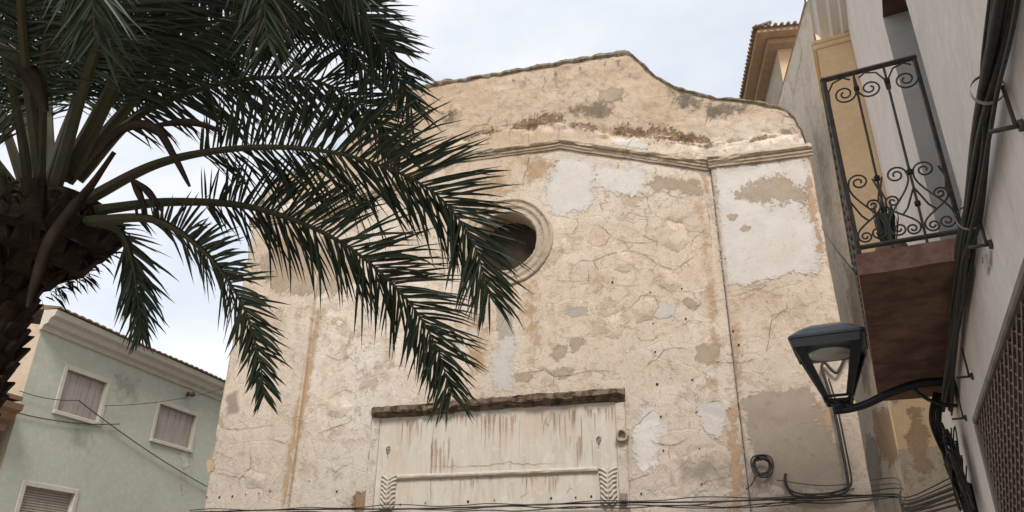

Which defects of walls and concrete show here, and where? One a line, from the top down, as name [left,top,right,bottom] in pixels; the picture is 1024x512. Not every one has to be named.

spalling [467,109,713,150]
peeling [540,150,826,290]
crack [559,192,787,366]
peeling [489,290,533,393]
crack [430,422,547,497]
peeling [630,402,670,477]
peeling [695,384,844,512]